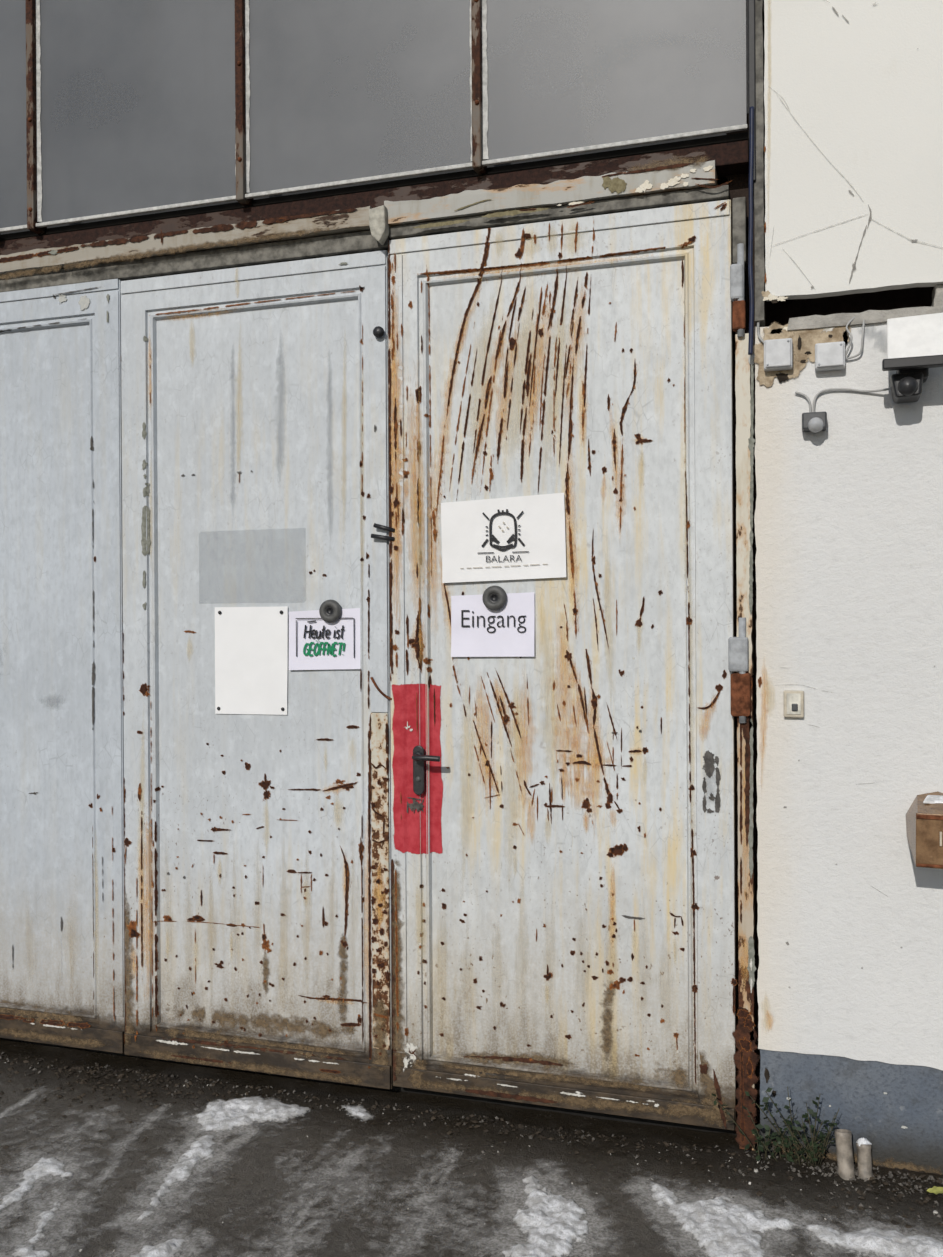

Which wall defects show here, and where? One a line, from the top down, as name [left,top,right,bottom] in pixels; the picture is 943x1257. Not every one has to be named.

peeling [602,165,713,194]
crack [848,190,872,283]
rust [388,240,430,680]
rust [416,221,696,824]
peeling [685,471,721,813]
spalling [748,287,934,614]
rust [123,731,397,1083]
rust [423,978,760,1148]
rust [601,960,626,1053]
rust [607,844,628,858]
spalling [622,953,665,1023]
peeling [670,829,700,1083]